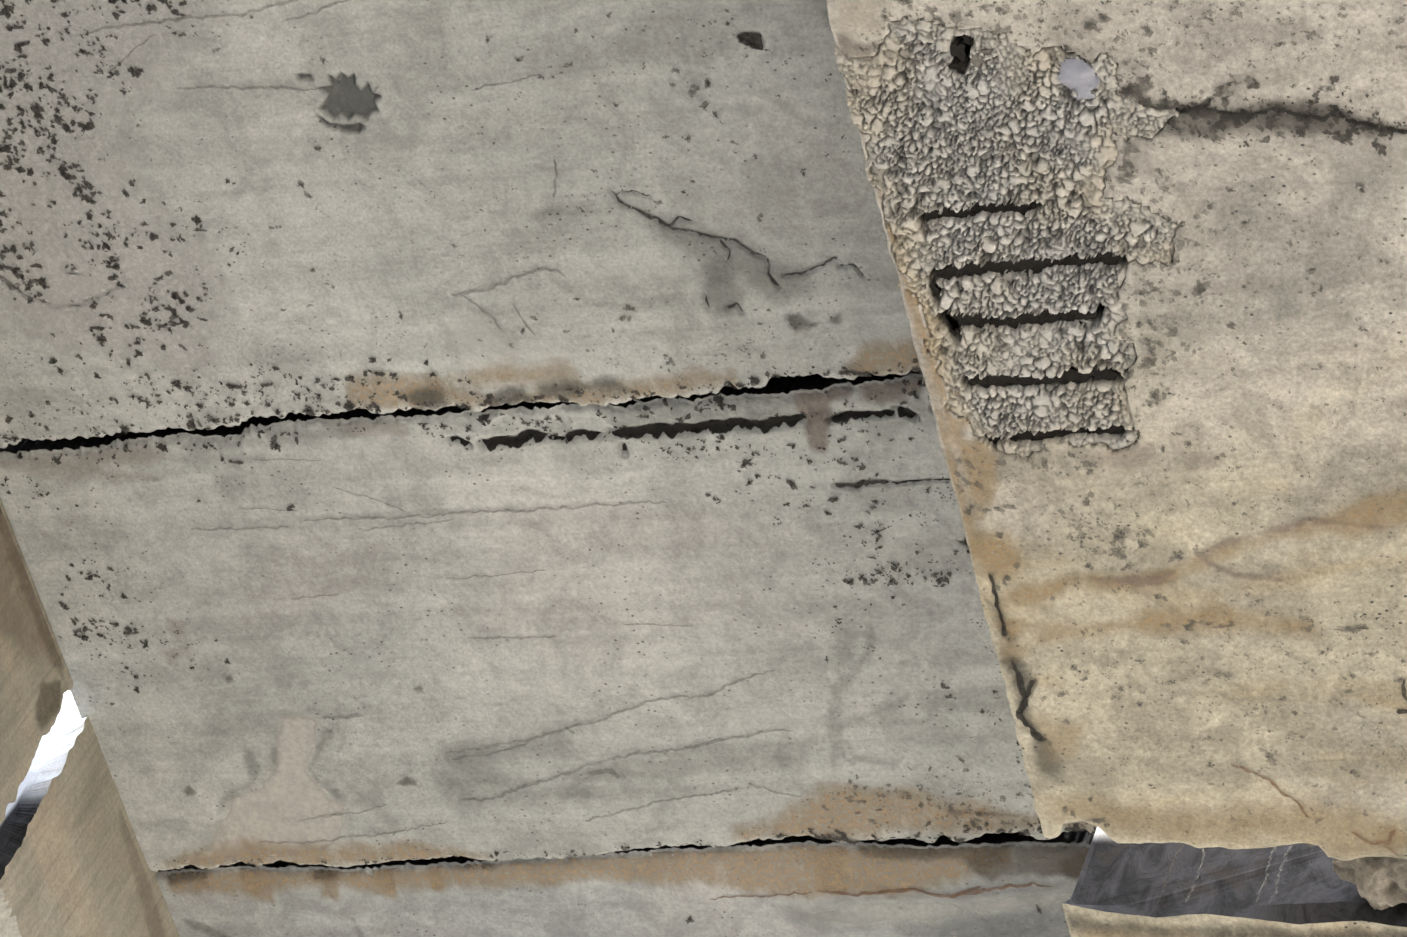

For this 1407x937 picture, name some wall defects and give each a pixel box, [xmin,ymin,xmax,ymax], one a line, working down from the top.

crack [1168,99,1407,134]
crack [615,190,863,285]
spalling [838,0,1407,440]
spalling [0,0,1200,606]
crack [450,407,917,452]
crack [835,479,950,488]
spalling [58,559,218,705]
crack [988,573,1047,741]
corrosion [168,844,488,881]
crack [712,882,1052,900]
spalling [773,755,1048,845]
corrosion [742,788,1089,878]